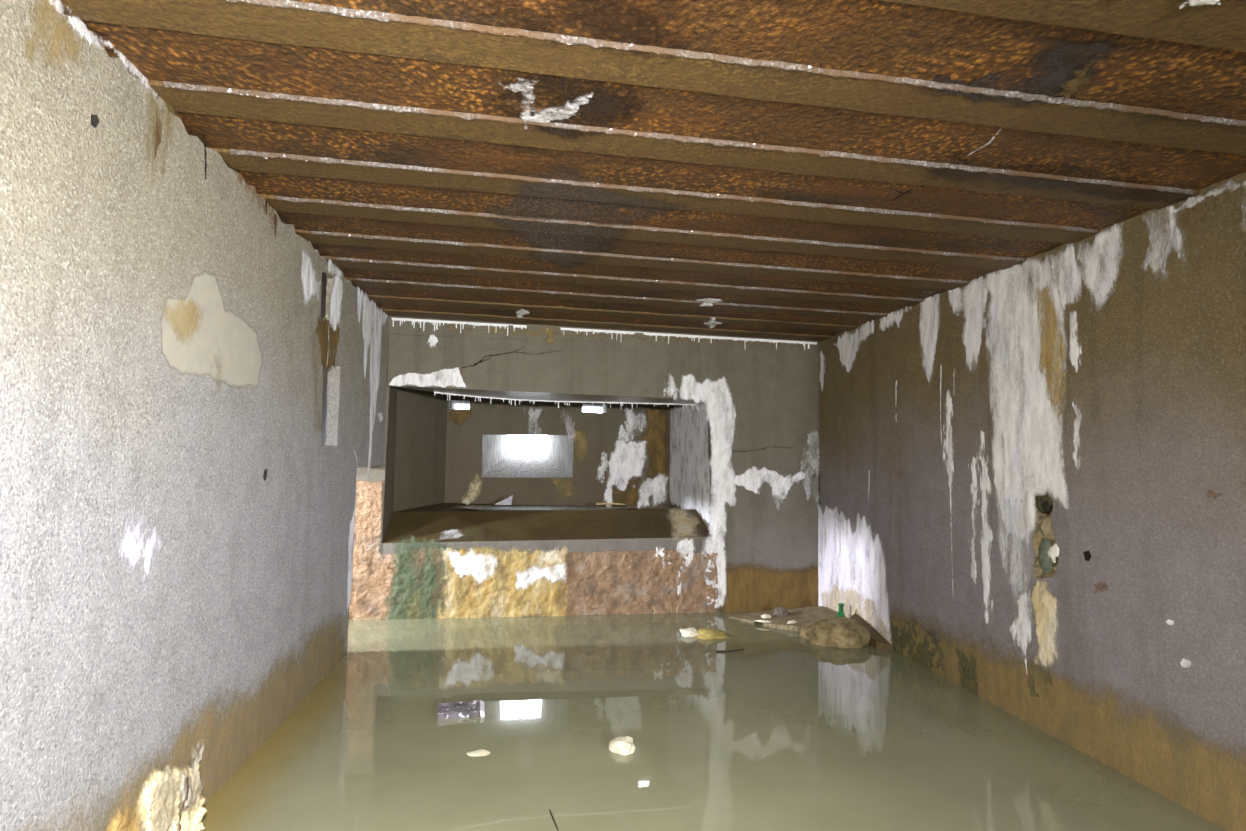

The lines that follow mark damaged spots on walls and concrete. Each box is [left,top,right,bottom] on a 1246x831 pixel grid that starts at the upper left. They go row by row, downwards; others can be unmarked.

damp [28,0,148,87]
damp [225,0,1246,127]
damp [163,77,1246,273]
damp [121,519,161,581]
flaking render [349,481,508,620]
flaking render [556,549,718,615]
damp [230,149,1246,831]
spalling [1032,492,1060,578]